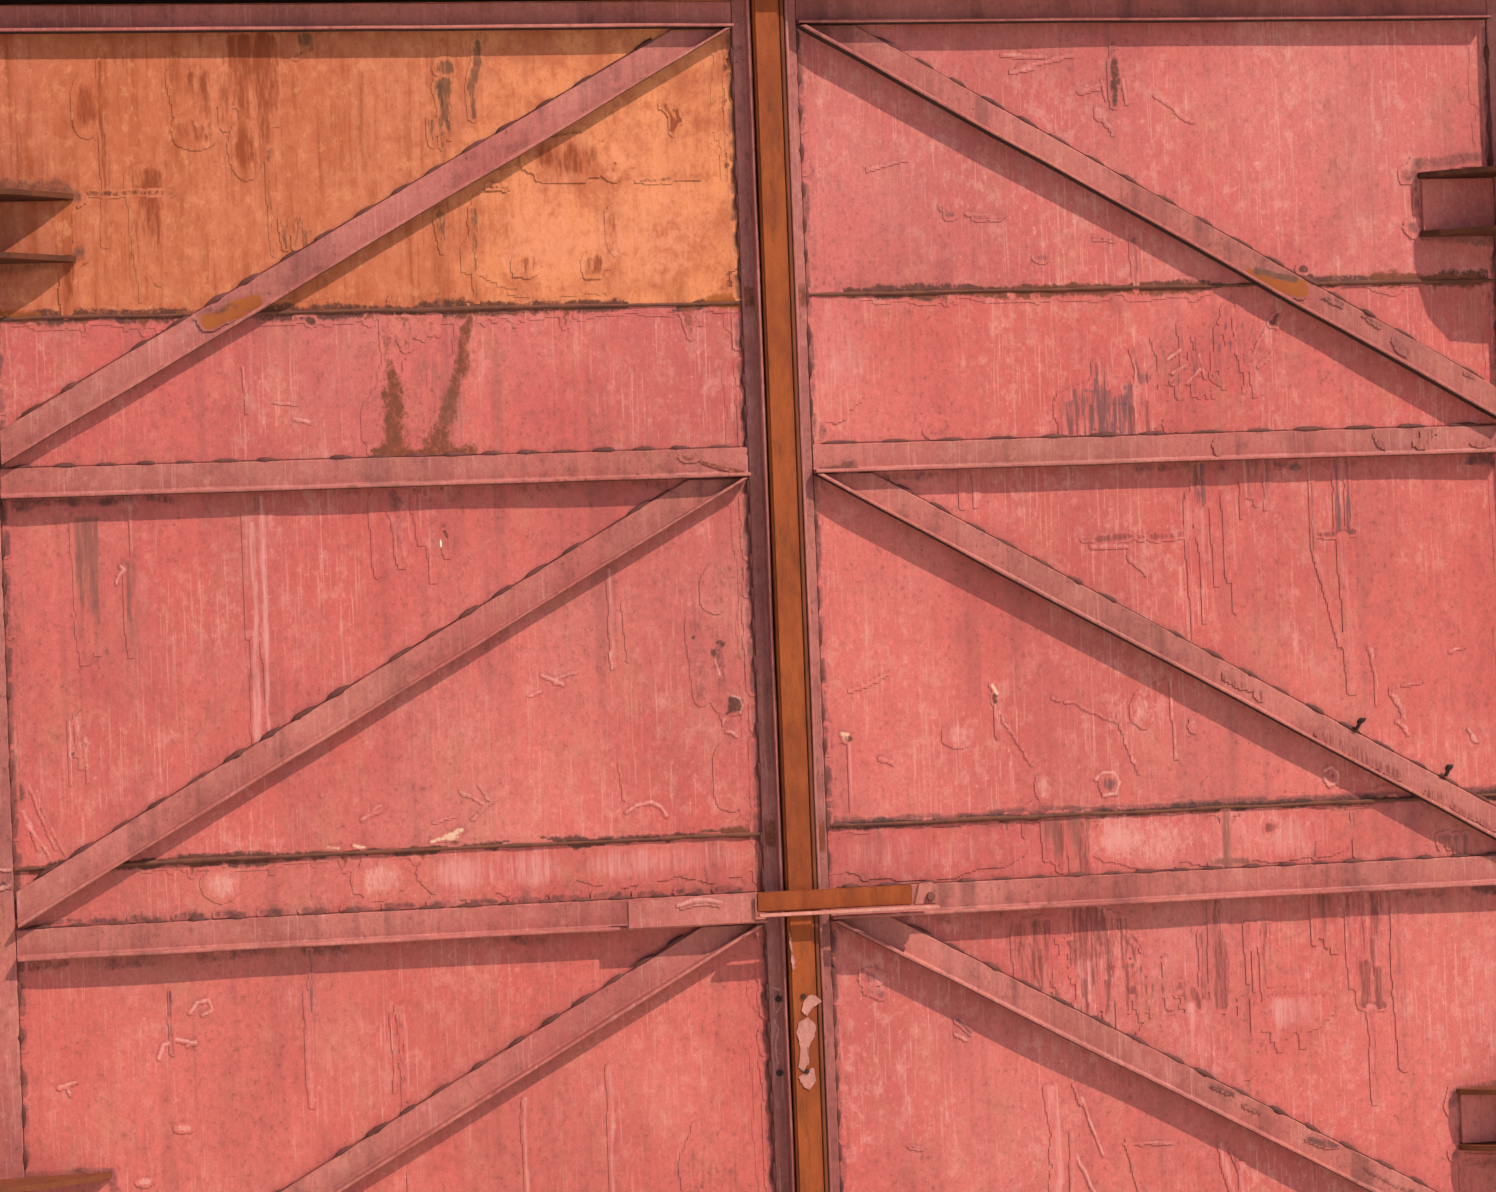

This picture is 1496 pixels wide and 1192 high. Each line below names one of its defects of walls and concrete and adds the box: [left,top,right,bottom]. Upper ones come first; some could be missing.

rust [165,32,284,181]
rust [0,58,644,458]
rust [666,281,755,341]
peeling [773,987,822,1090]